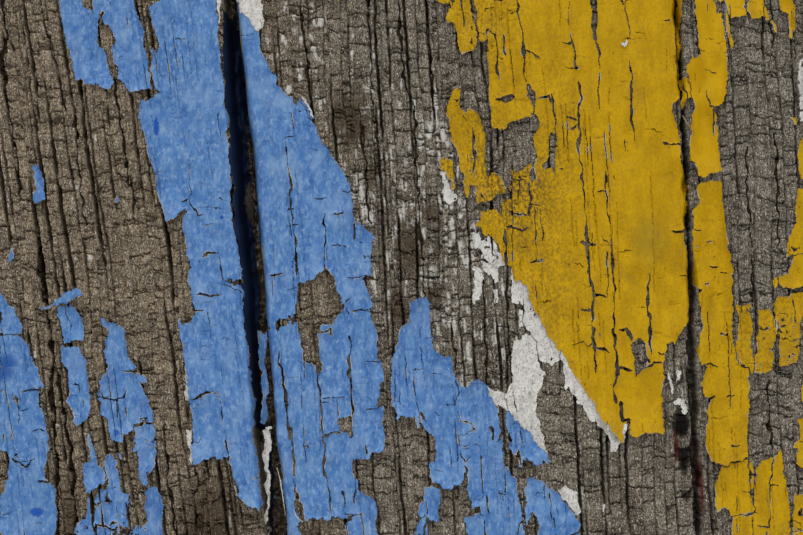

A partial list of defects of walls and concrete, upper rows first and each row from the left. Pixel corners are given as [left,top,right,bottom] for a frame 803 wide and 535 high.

peeling [0,293,57,535]
peeling [41,0,581,535]
peeling [437,0,803,535]